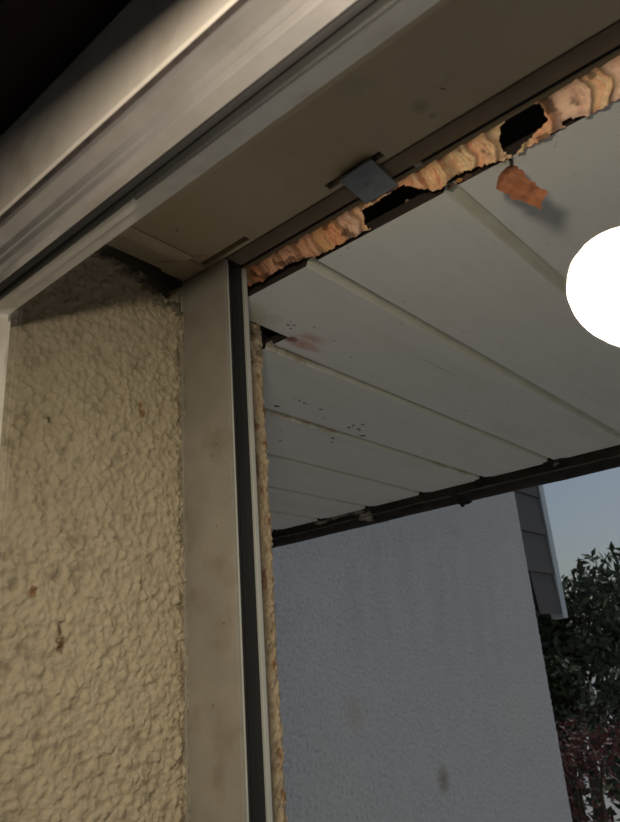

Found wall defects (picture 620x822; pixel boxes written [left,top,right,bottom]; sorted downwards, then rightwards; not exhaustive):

peeling [496,159,548,209]